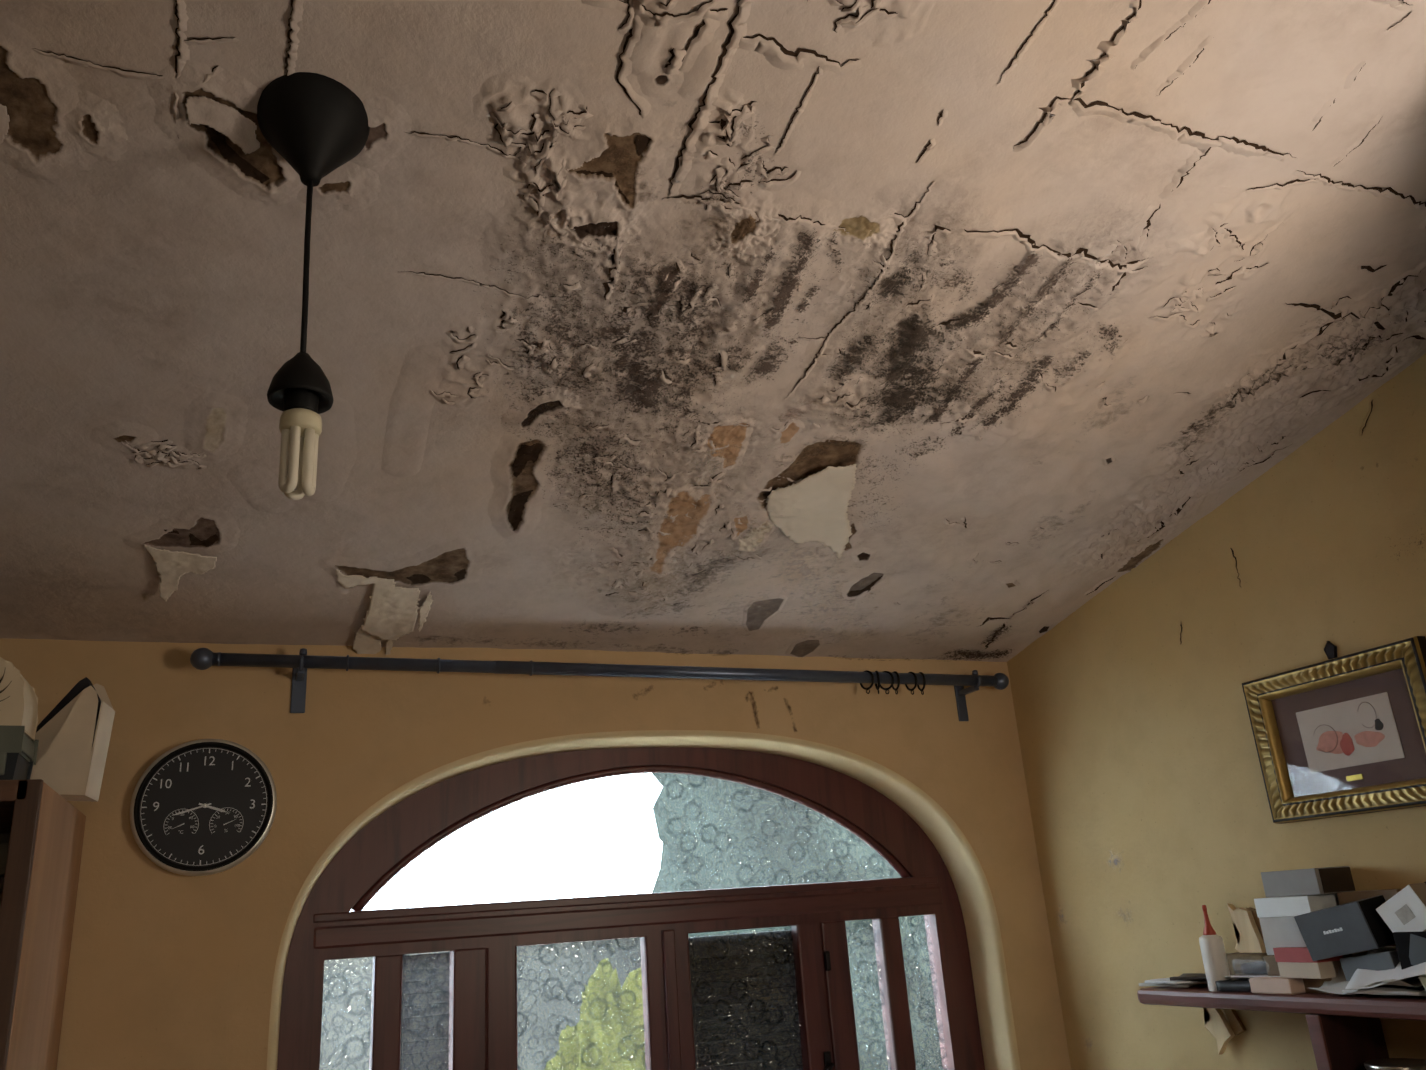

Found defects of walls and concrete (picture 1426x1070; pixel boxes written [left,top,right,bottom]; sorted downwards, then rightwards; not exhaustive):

spalling [0,19,128,181]
spalling [146,60,414,214]
crack [284,0,304,76]
crack [398,235,702,320]
spalling [534,108,685,257]
crack [569,0,863,233]
crack [784,110,948,400]
crack [960,0,1426,436]
water stain [500,218,841,536]
water stain [821,244,1122,524]
spalling [641,417,891,575]
peeling [317,538,486,655]